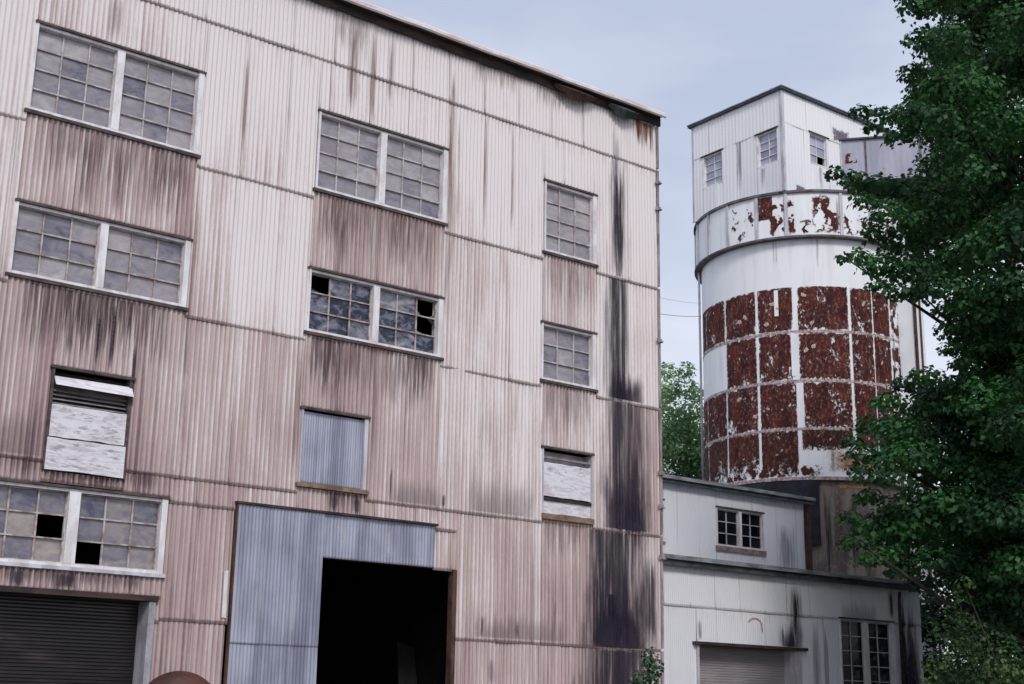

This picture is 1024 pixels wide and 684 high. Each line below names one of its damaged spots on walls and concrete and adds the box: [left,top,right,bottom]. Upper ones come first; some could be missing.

rust [637,120,653,149]
water stain [95,311,116,361]
rust [703,286,901,482]
water stain [592,170,655,684]
water stain [782,593,799,647]